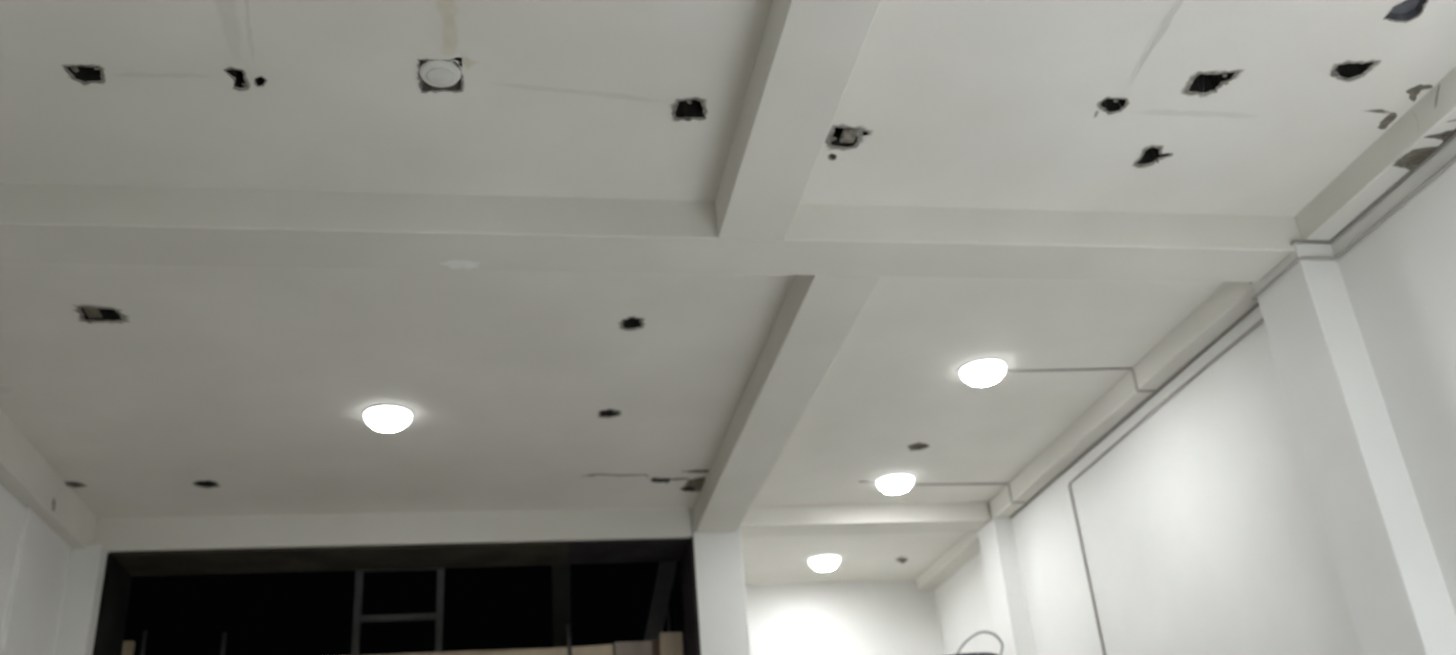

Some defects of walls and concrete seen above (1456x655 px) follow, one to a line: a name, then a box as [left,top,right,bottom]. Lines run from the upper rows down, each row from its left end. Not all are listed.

flaking render [1361,82,1456,171]